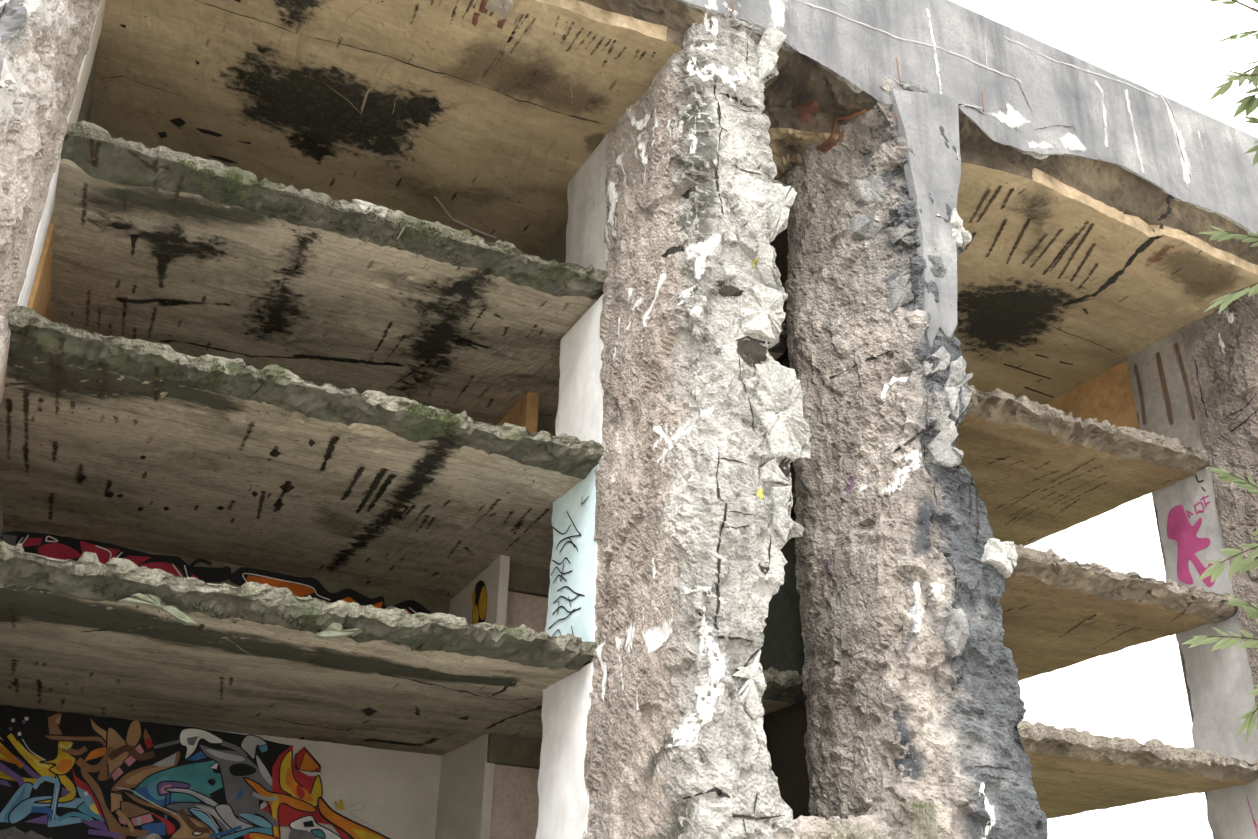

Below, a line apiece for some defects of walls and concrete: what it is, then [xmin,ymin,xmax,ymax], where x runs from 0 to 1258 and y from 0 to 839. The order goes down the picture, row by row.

crack [725,16,764,66]
damp [213,0,599,193]
flaking render [351,199,388,220]
crack [799,0,1191,358]
damp [293,268,495,397]
spalling [716,280,744,297]
spalling [737,339,767,369]
damp [956,278,1089,356]
damp [327,429,461,572]
crack [714,336,790,667]
flaking render [118,592,197,626]
crack [672,787,785,839]